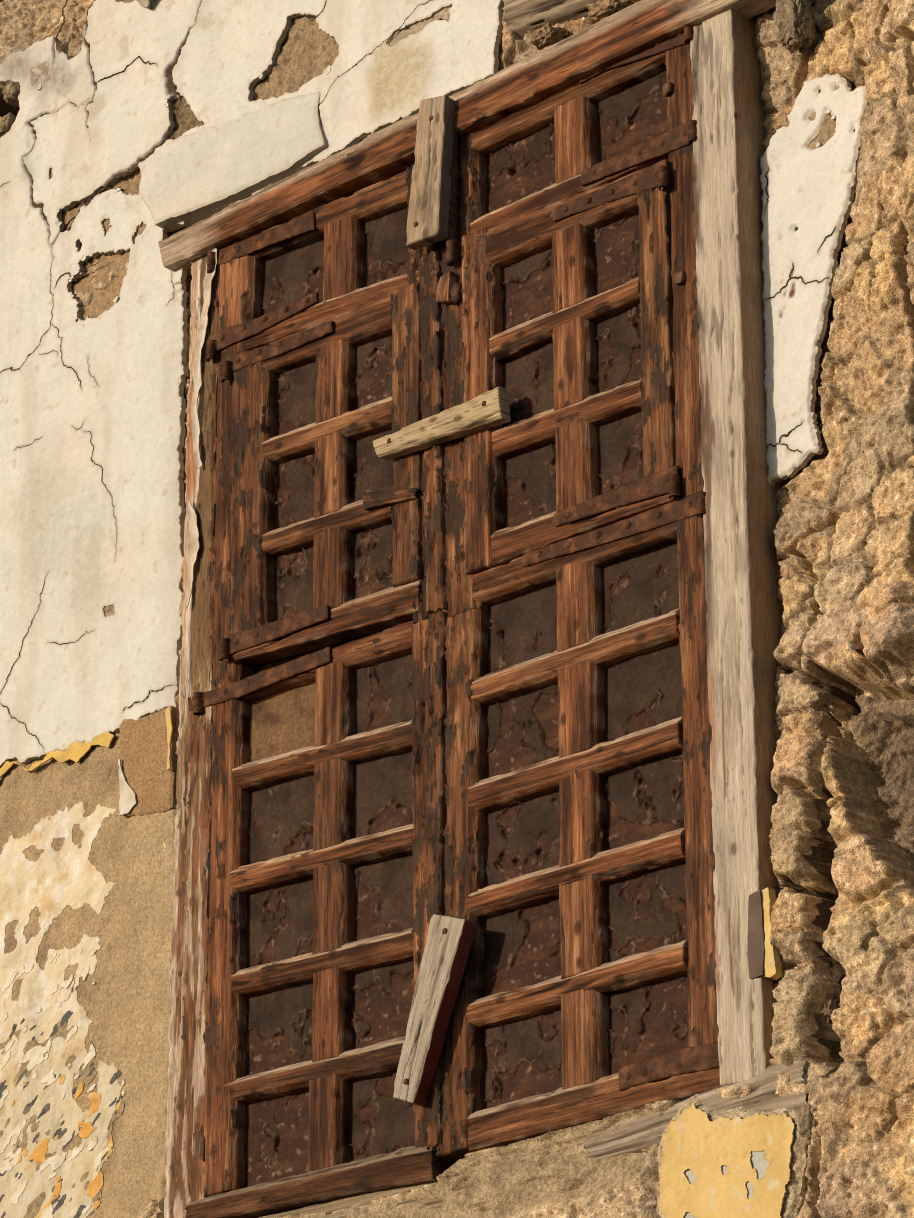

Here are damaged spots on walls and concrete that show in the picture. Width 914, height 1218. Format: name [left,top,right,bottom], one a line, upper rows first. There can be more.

flaking render [253,16,339,101]
crack [318,0,430,126]
flaking render [806,108,836,150]
crack [1,0,187,389]
flaking render [68,223,146,320]
crack [75,426,117,554]
crack [0,573,95,747]
peeling [0,732,115,778]
crack [122,685,172,713]
peeling [0,759,137,1218]
peeling [658,1102,795,1218]